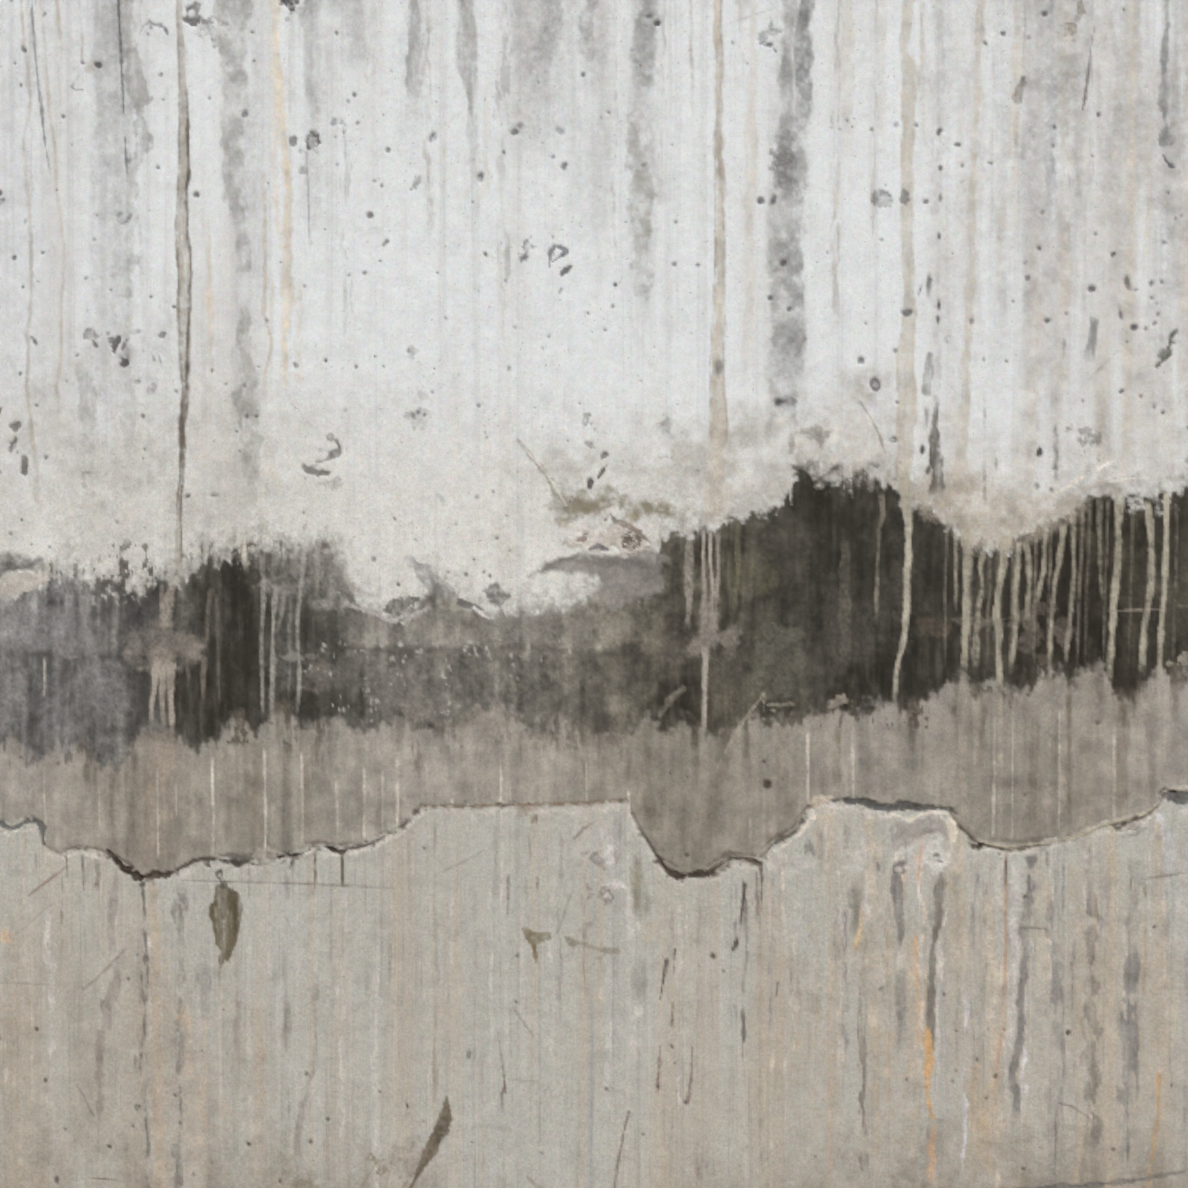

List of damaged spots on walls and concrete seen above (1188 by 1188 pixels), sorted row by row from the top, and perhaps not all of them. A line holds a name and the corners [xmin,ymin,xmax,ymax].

corrosion [65,852,103,895]
water stain [0,848,356,1188]
crack [0,804,431,890]
water stain [367,906,396,1188]
water stain [423,820,443,1138]
crack [463,798,532,812]
water stain [667,897,702,1169]
corrosion [755,857,777,942]
crack [616,792,1075,953]
corrosion [785,809,995,1188]
water stain [978,826,1113,1184]
crack [1111,786,1188,839]